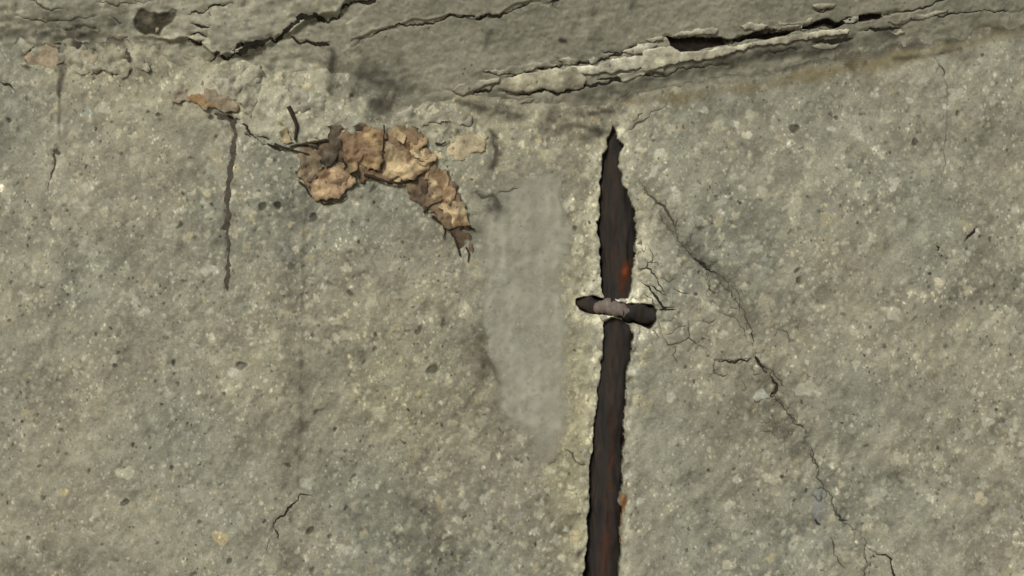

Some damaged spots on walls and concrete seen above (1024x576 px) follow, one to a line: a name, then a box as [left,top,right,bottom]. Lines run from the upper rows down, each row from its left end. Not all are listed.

crack [188,0,376,62]
crack [354,0,559,46]
crack [213,113,286,291]
spalling [576,296,611,322]
crack [637,178,895,576]
spalling [617,298,657,576]
crack [261,493,313,557]